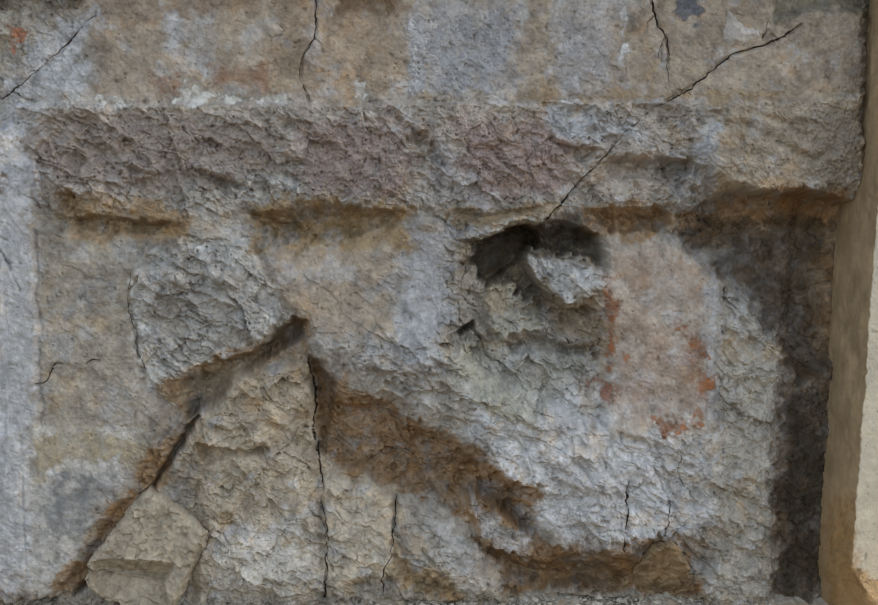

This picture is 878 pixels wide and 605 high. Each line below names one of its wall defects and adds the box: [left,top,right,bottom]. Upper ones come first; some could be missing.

crack [2,15,96,100]
crack [299,0,321,99]
crack [545,0,801,220]
corrosion [588,379,621,405]
corrosion [652,414,704,439]